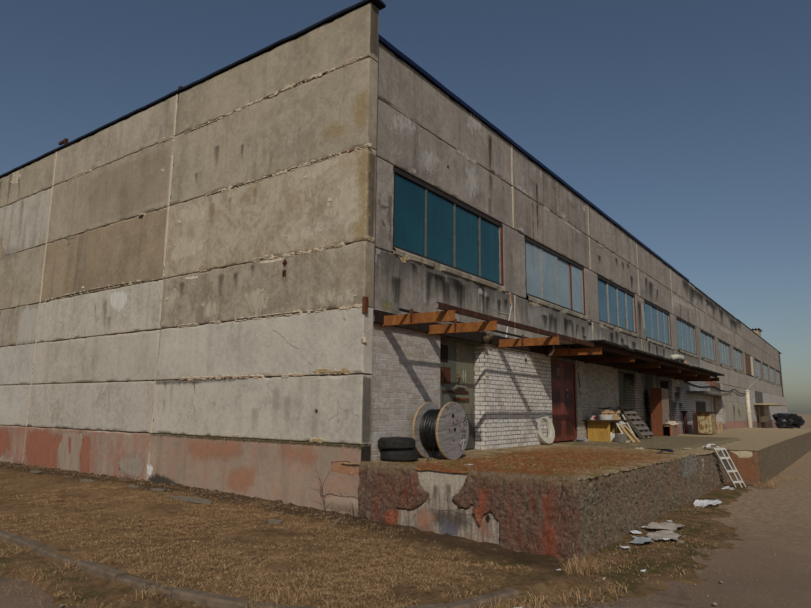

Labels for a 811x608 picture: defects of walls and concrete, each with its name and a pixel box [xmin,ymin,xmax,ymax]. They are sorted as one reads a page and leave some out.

peeling [25,431,90,473]
spalling [397,471,500,545]